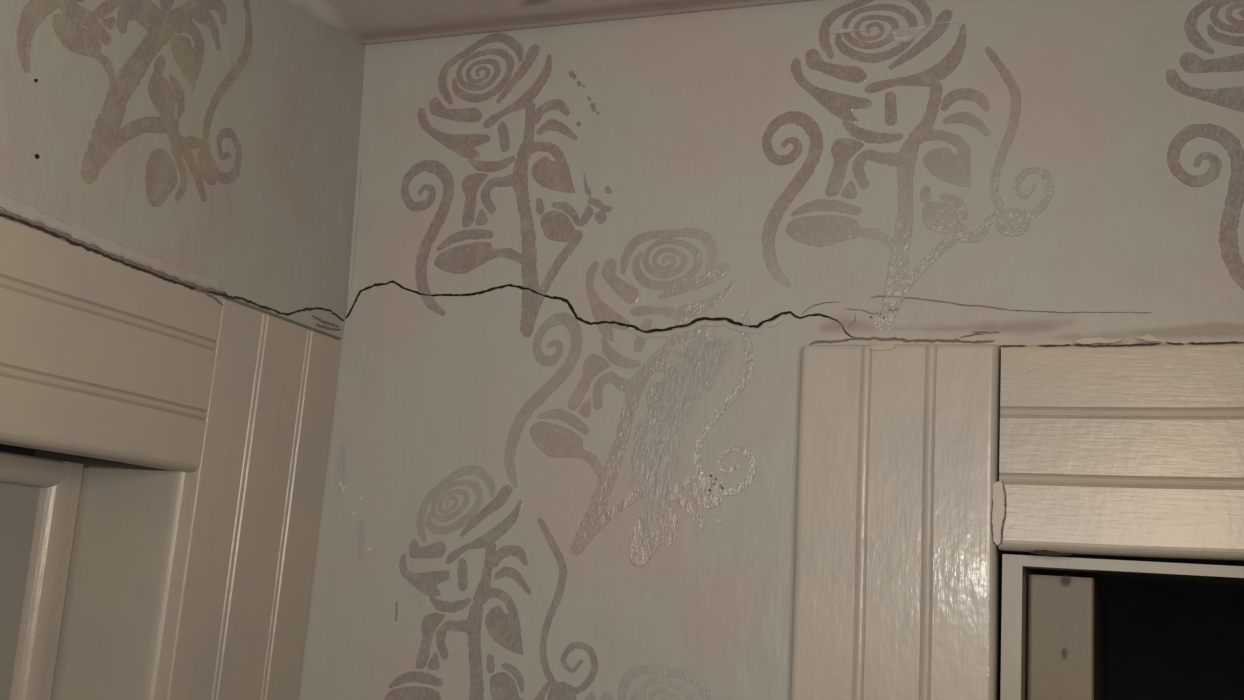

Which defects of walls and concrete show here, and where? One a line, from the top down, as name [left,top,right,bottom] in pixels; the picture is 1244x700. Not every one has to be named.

crack [0,207,1244,347]